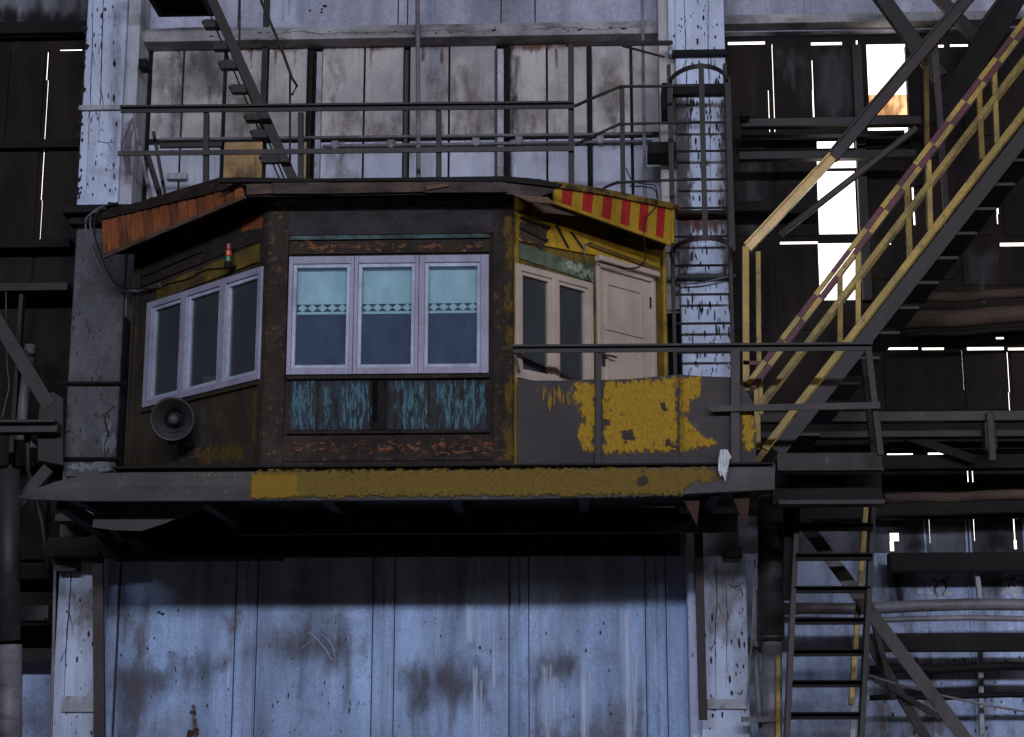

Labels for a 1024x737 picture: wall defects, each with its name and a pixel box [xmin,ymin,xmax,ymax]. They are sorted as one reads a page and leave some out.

peeling [248,97,730,499]
damp [473,668,482,733]
damp [581,614,638,737]